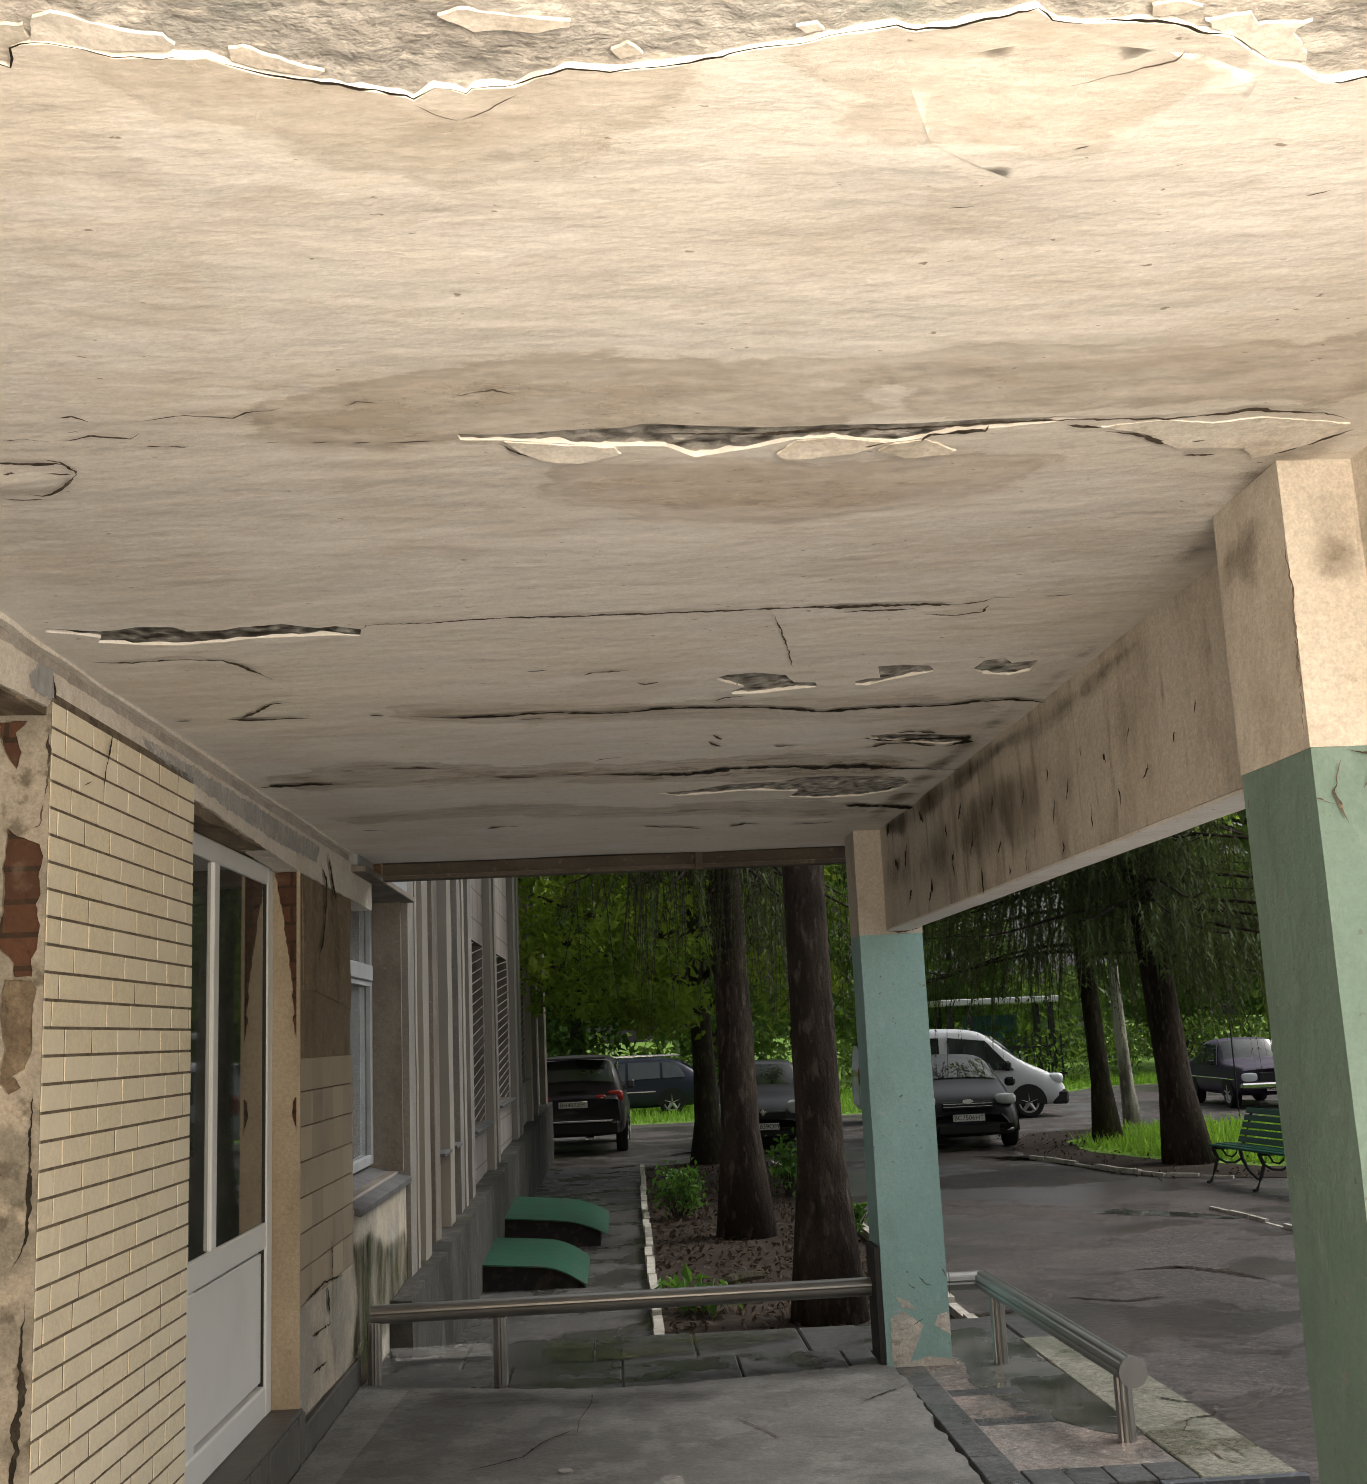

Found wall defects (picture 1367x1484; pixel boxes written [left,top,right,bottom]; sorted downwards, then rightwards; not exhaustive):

spalling [0,0,1367,100]
crack [650,407,1351,456]
crack [362,597,1014,667]
crack [1284,541,1304,730]
spalling [0,721,26,768]
crack [370,670,1043,779]
spalling [719,673,817,692]
crack [802,804,912,824]
leakage [887,746,999,832]
spalling [0,830,43,1094]
peeling [890,1297,955,1367]
crack [8,1303,27,1484]